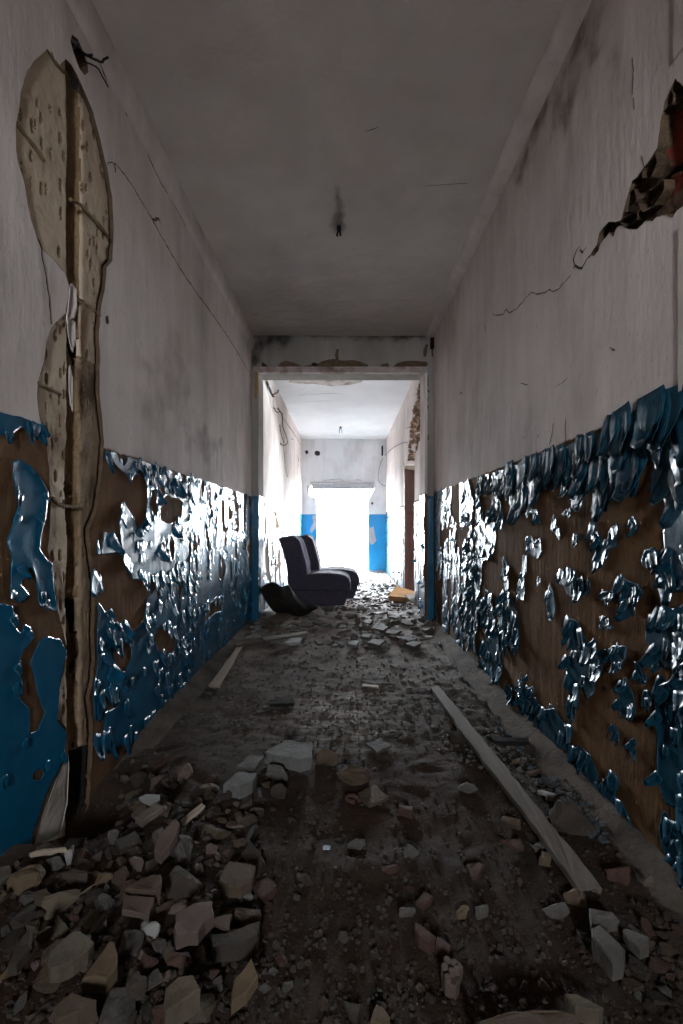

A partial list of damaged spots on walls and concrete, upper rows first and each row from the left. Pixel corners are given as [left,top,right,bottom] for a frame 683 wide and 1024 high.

spalling [0,34,316,856]
peeling [369,384,683,890]
crack [485,246,592,331]
spalling [591,79,683,256]